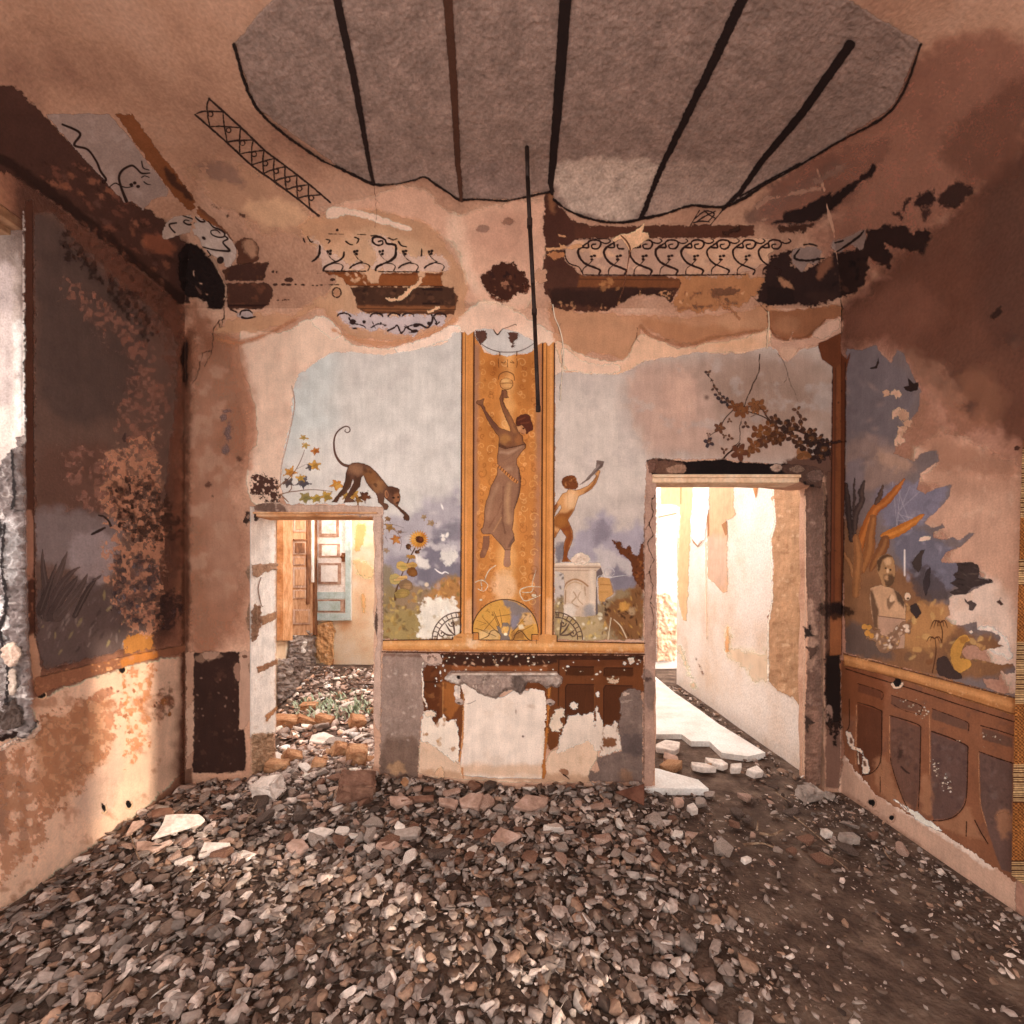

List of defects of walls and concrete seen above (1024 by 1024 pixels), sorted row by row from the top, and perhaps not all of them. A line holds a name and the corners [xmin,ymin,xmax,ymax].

peeling [0,425,220,910]
flaking render [177,243,227,309]
leakage [16,162,468,785]
flaking render [232,0,922,786]
leakage [549,35,1024,443]
peeling [914,431,1022,694]